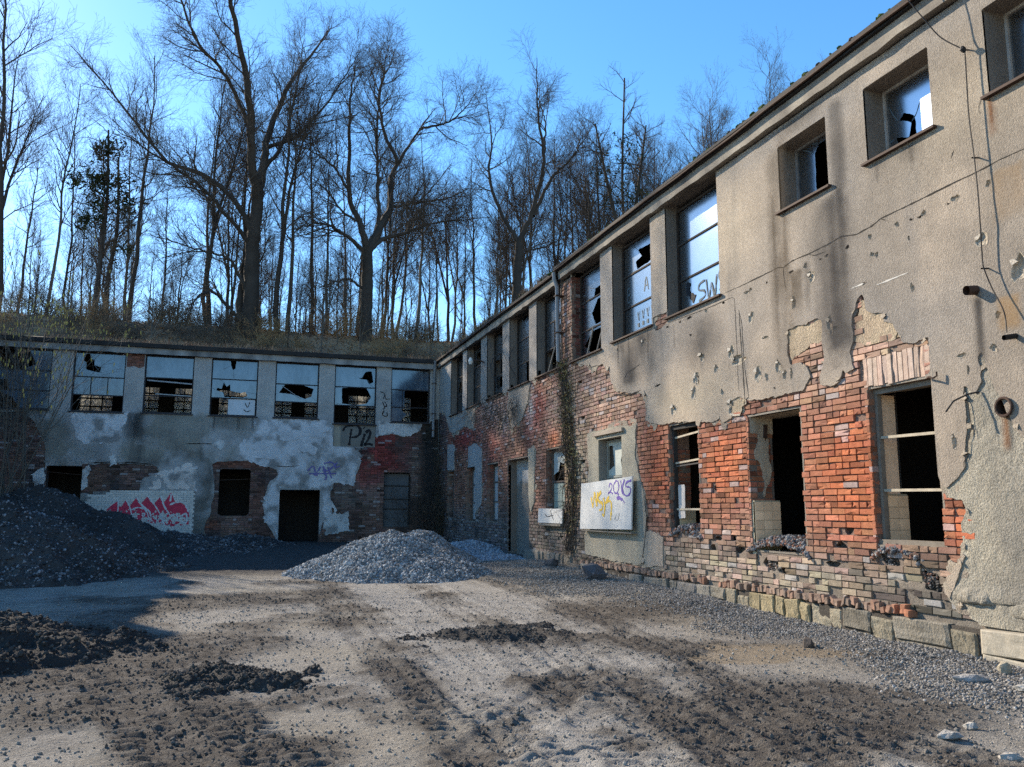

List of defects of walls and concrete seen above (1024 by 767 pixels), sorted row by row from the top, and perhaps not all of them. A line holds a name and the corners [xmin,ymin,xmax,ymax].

flaking render [81,455,198,494]
flaking render [204,279,1024,632]
crack [963,390,974,466]